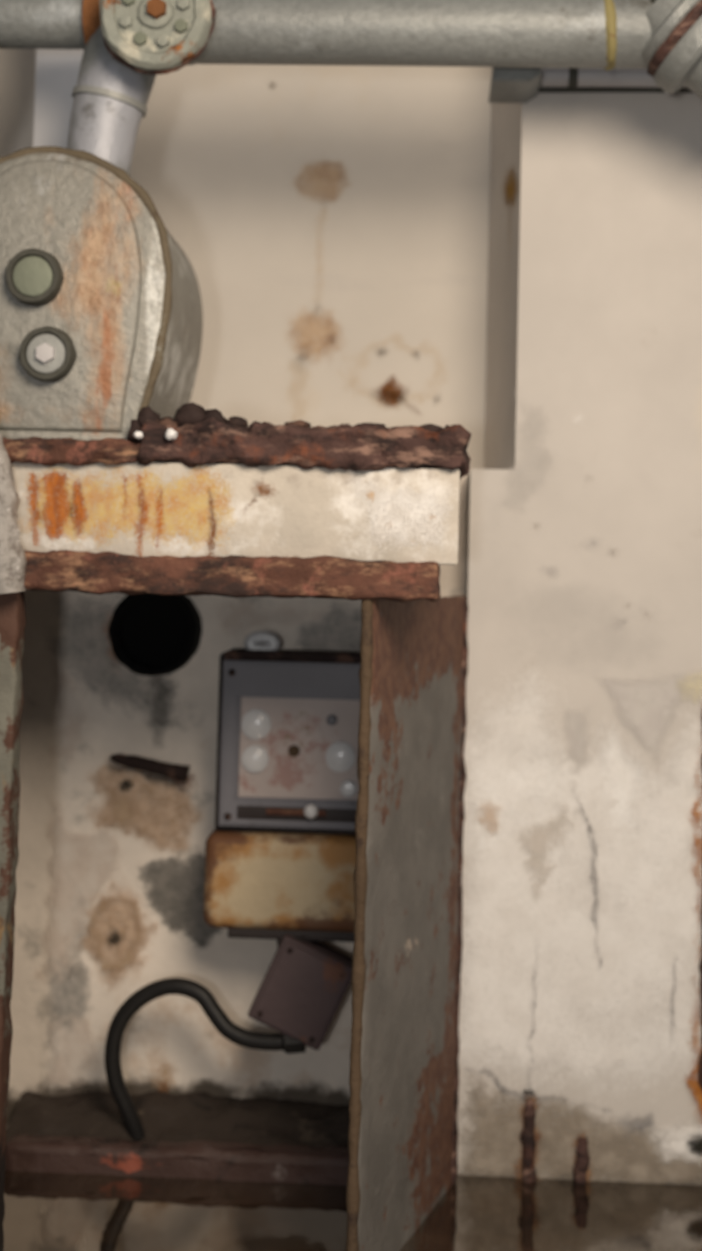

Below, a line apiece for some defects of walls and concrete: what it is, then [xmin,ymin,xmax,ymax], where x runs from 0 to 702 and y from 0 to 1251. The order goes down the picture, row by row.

corrosion [339,333,451,415]
corrosion [19,461,279,557]
crack [568,784,603,966]
corrosion [684,704,702,1126]